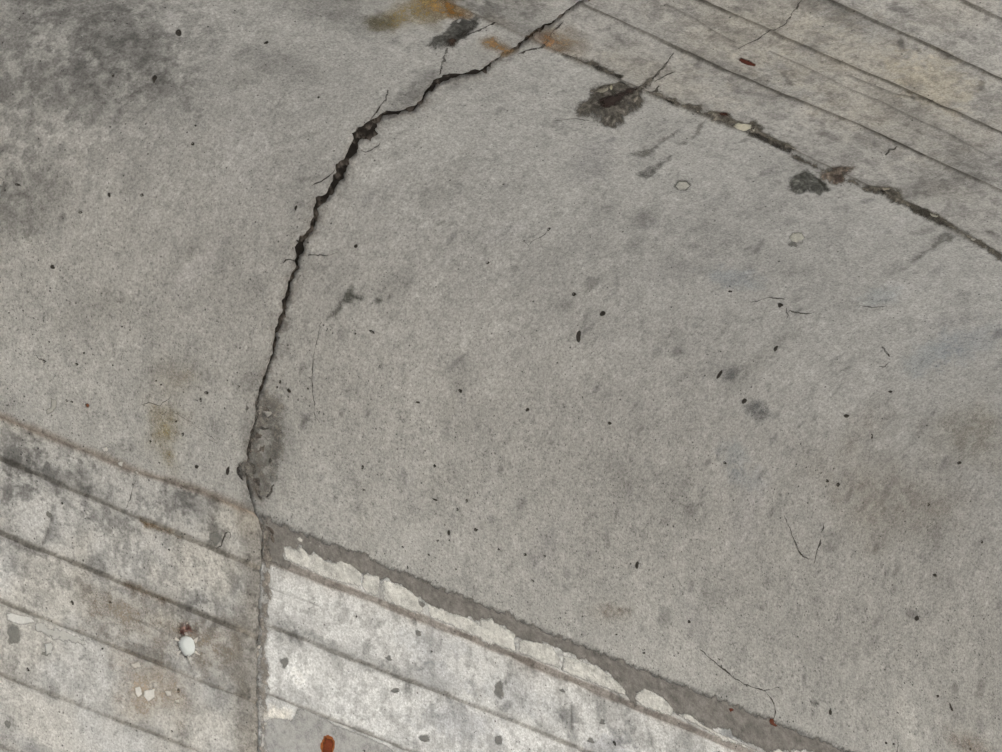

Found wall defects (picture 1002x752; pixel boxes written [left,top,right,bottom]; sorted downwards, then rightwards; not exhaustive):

corrosion [369,0,466,31]
crack [738,1,801,49]
crack [641,52,674,92]
spalling [562,53,1002,261]
crack [237,1,579,566]
crack [746,297,811,317]
crack [784,515,825,563]
peeling [260,515,849,752]
crack [701,650,778,718]
corrosion [320,735,335,752]